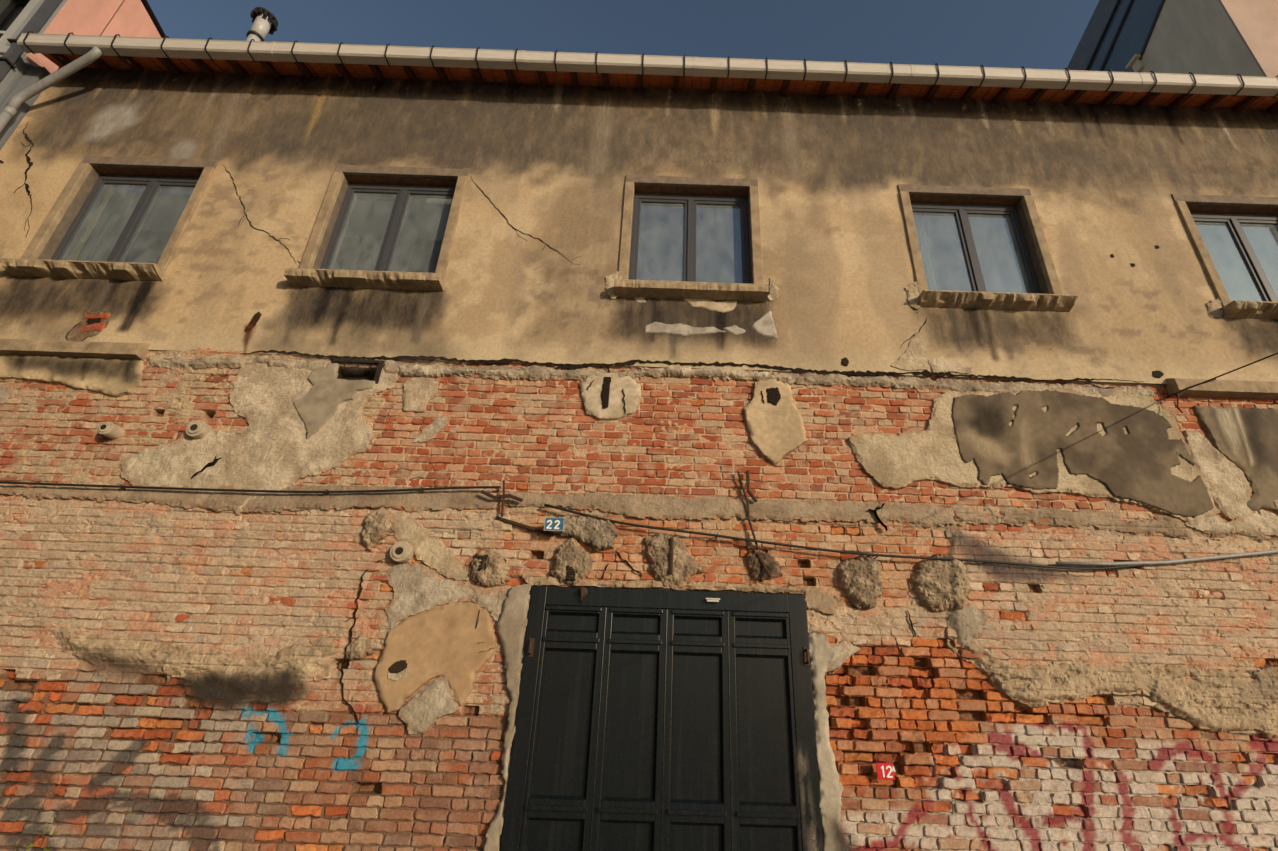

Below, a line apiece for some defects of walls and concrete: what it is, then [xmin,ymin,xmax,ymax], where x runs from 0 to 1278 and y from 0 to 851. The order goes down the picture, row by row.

crack [14,121,34,236]
crack [225,169,300,264]
crack [471,177,581,265]
water stain [33,68,1278,192]
peeling [0,354,144,405]
peeling [645,278,780,339]
peeling [891,333,973,375]
peeling [120,359,450,516]
peeling [847,388,1278,537]
peeling [41,617,359,700]
peeling [374,510,509,736]
peeling [942,603,1278,740]